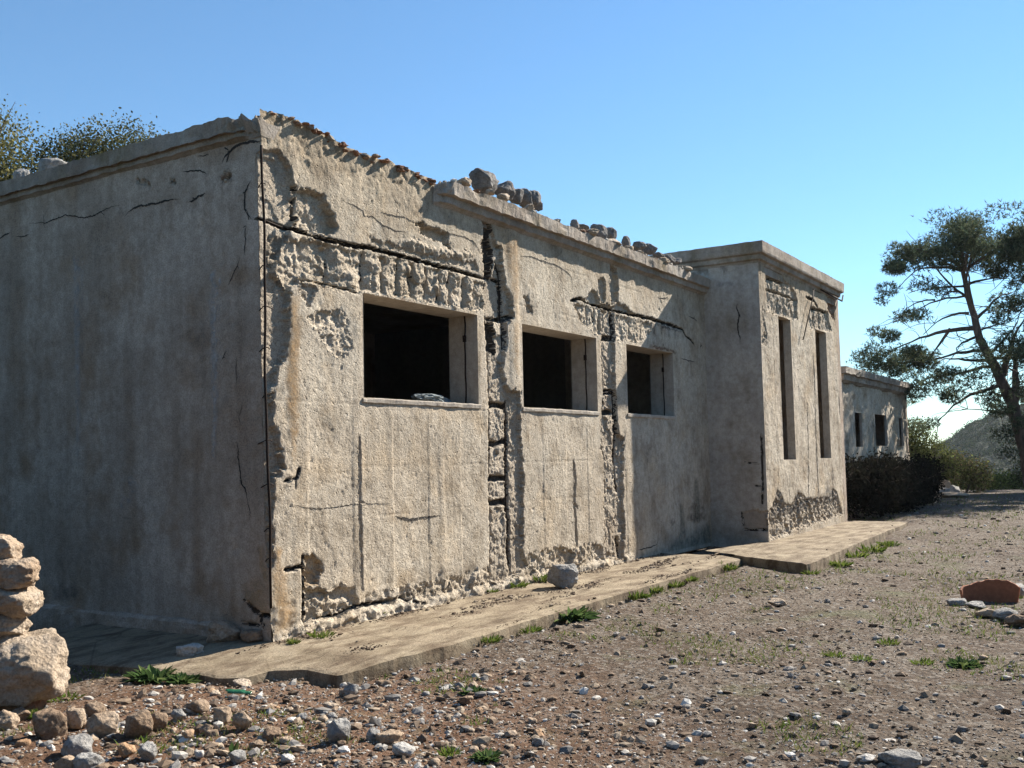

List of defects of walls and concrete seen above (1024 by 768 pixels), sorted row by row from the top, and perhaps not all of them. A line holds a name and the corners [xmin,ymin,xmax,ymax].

spalling [255,147,652,604]